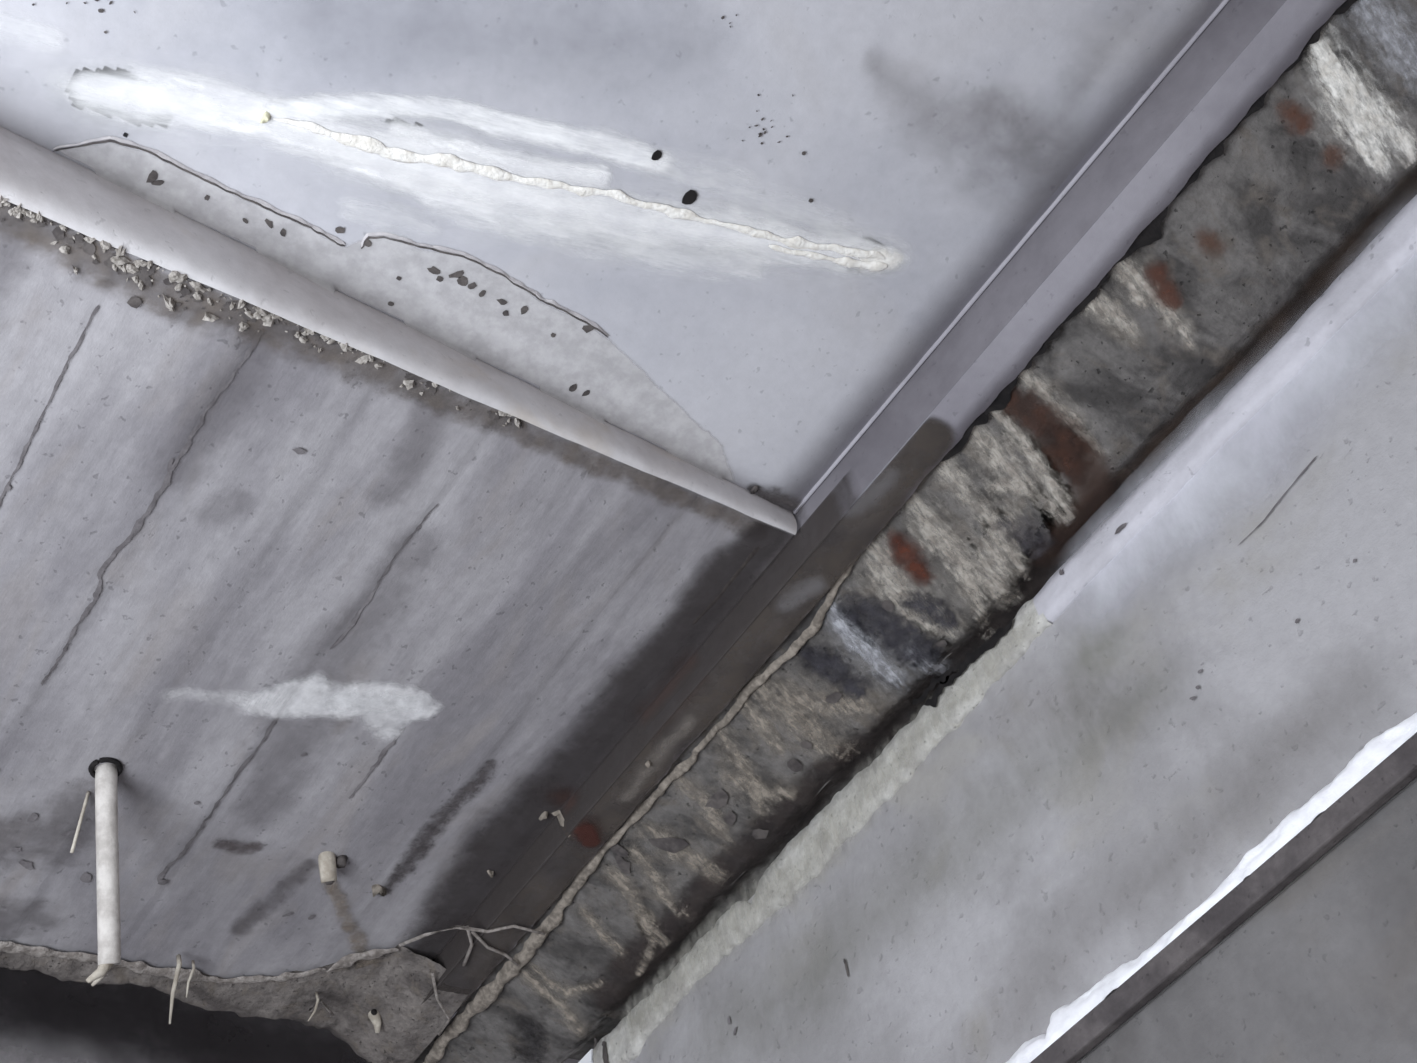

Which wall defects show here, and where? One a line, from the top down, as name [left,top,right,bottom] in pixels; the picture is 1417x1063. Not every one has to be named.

efflorescence [69,72,902,273]
crack [0,305,99,506]
crack [41,330,264,686]
rust [890,534,929,584]
damp [411,38,1417,1063]
damp [237,674,438,739]
crack [157,716,280,882]
damp [214,841,261,853]
damp [386,761,494,894]
peeling [674,619,1020,984]
damp [0,941,399,1063]